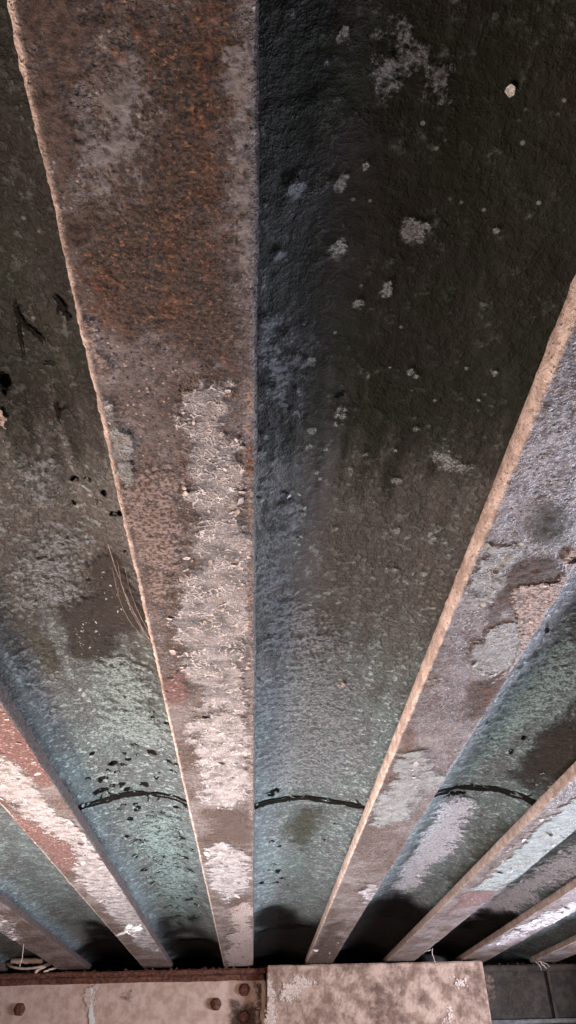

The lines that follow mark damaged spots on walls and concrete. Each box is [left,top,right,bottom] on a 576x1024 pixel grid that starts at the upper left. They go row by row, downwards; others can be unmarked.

rust [18,0,254,383]
peeling [465,543,528,607]
water stain [4,523,172,749]
peeling [469,619,527,679]
crack [78,790,188,813]
crack [254,795,366,810]
crack [434,783,537,806]
water stain [335,797,480,963]
water stain [58,919,142,970]